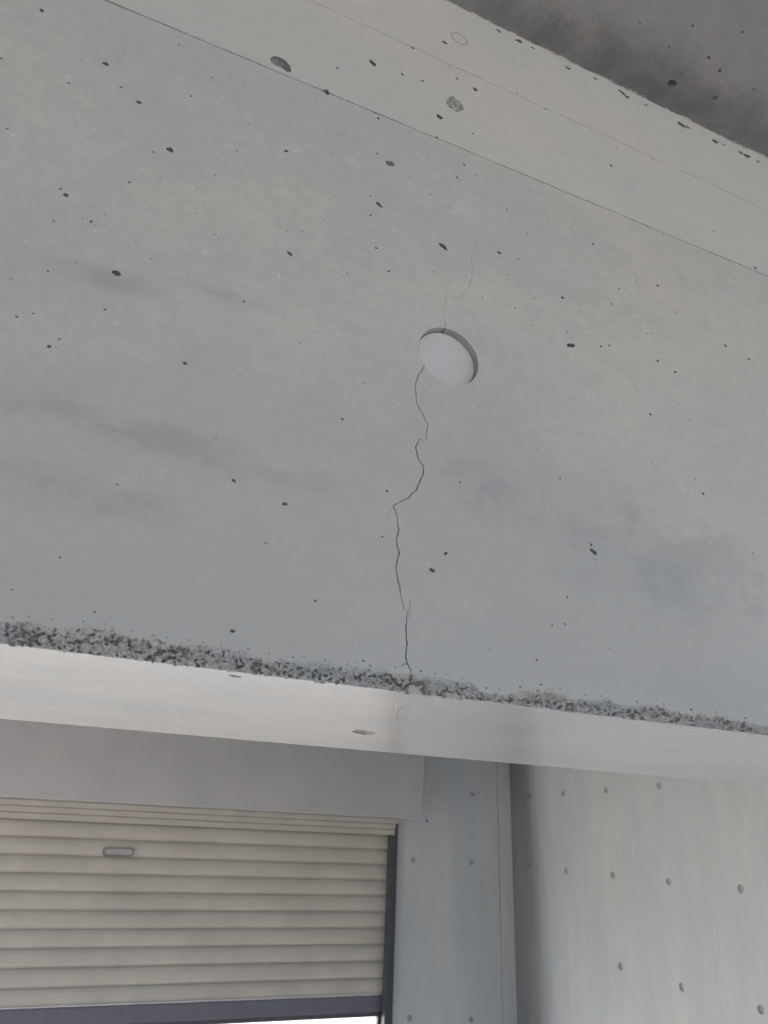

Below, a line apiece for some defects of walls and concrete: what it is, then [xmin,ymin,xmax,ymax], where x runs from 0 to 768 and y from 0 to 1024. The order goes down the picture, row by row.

crack [387,366,428,680]